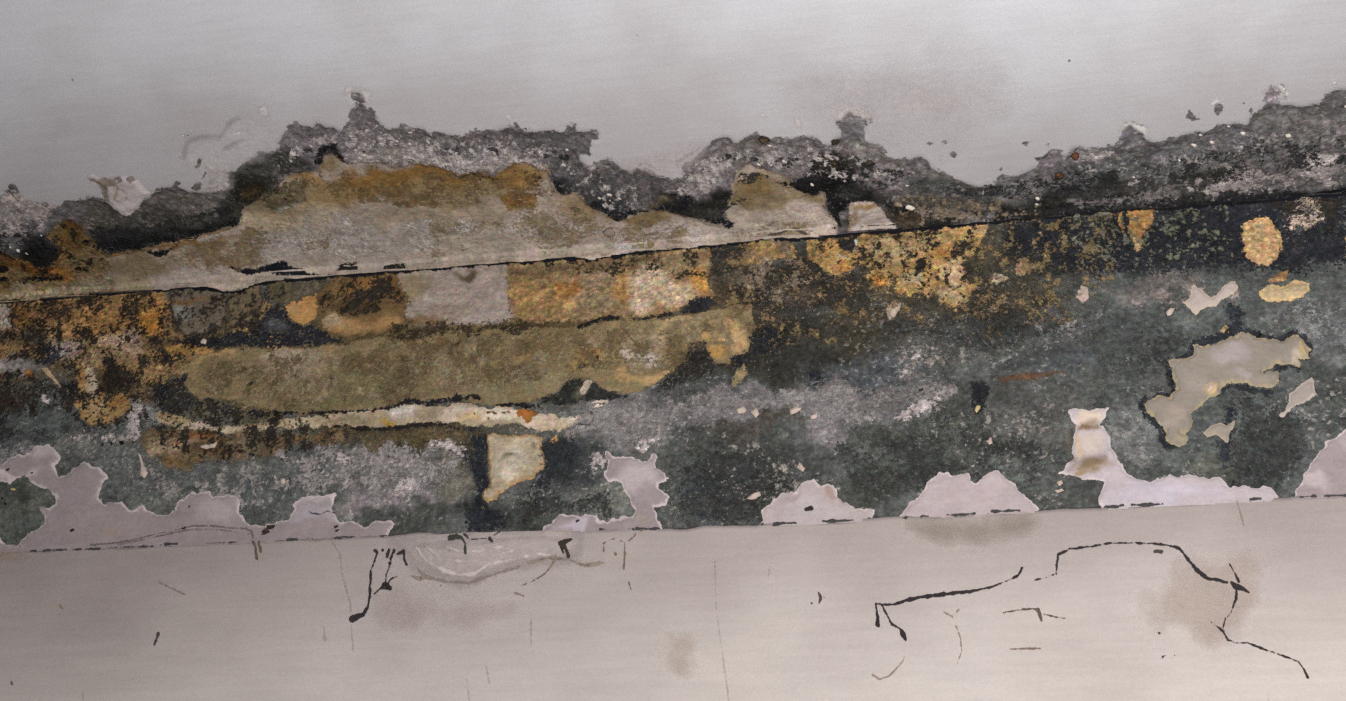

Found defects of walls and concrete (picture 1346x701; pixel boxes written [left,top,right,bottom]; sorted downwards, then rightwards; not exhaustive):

crack [0,189,1346,304]
flaking render [0,153,1325,510]
leakage [0,80,1346,546]
peeling [0,444,394,553]
crack [30,510,408,641]
peeling [543,451,670,532]
peeling [748,463,875,527]
crack [514,503,1163,597]
peeling [900,470,1039,520]
crack [872,542,1309,680]
peeling [1295,429,1346,501]
crack [1298,492,1346,500]